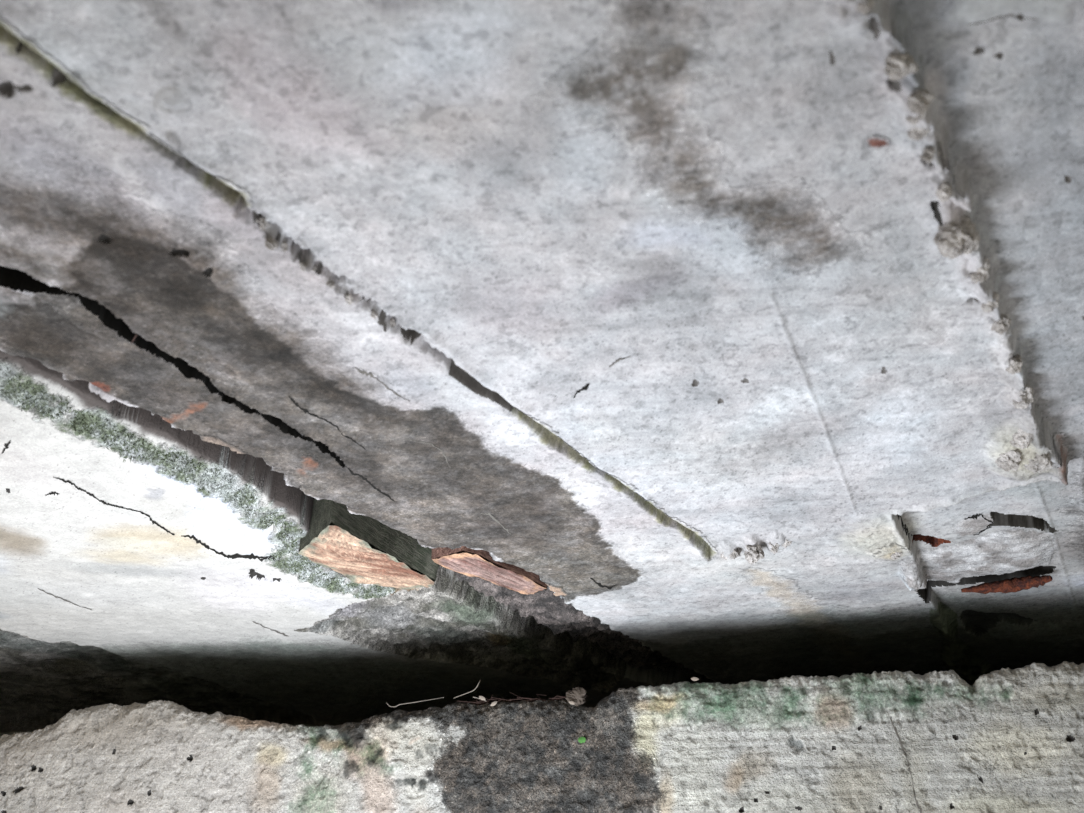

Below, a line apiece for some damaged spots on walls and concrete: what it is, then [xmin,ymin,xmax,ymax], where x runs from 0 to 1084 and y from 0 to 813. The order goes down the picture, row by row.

water stain [529,0,892,276]
spalling [377,309,386,332]
crack [0,266,395,502]
water stain [0,150,648,603]
spalling [198,435,248,454]
crack [45,477,280,562]
spalling [249,569,281,582]
spalling [896,512,1059,603]
spalling [0,629,137,733]
spalling [294,565,626,694]
water stain [312,687,669,813]